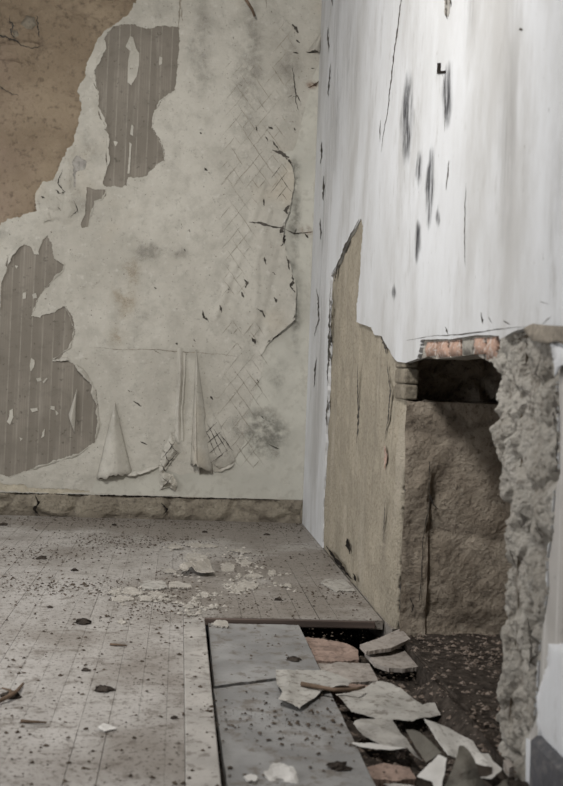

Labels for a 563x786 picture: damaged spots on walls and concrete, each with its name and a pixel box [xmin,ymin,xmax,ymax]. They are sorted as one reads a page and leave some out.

spalling [0,0,180,228]
peeling [0,65,319,523]
peeling [292,24,321,54]
spalling [324,220,563,782]